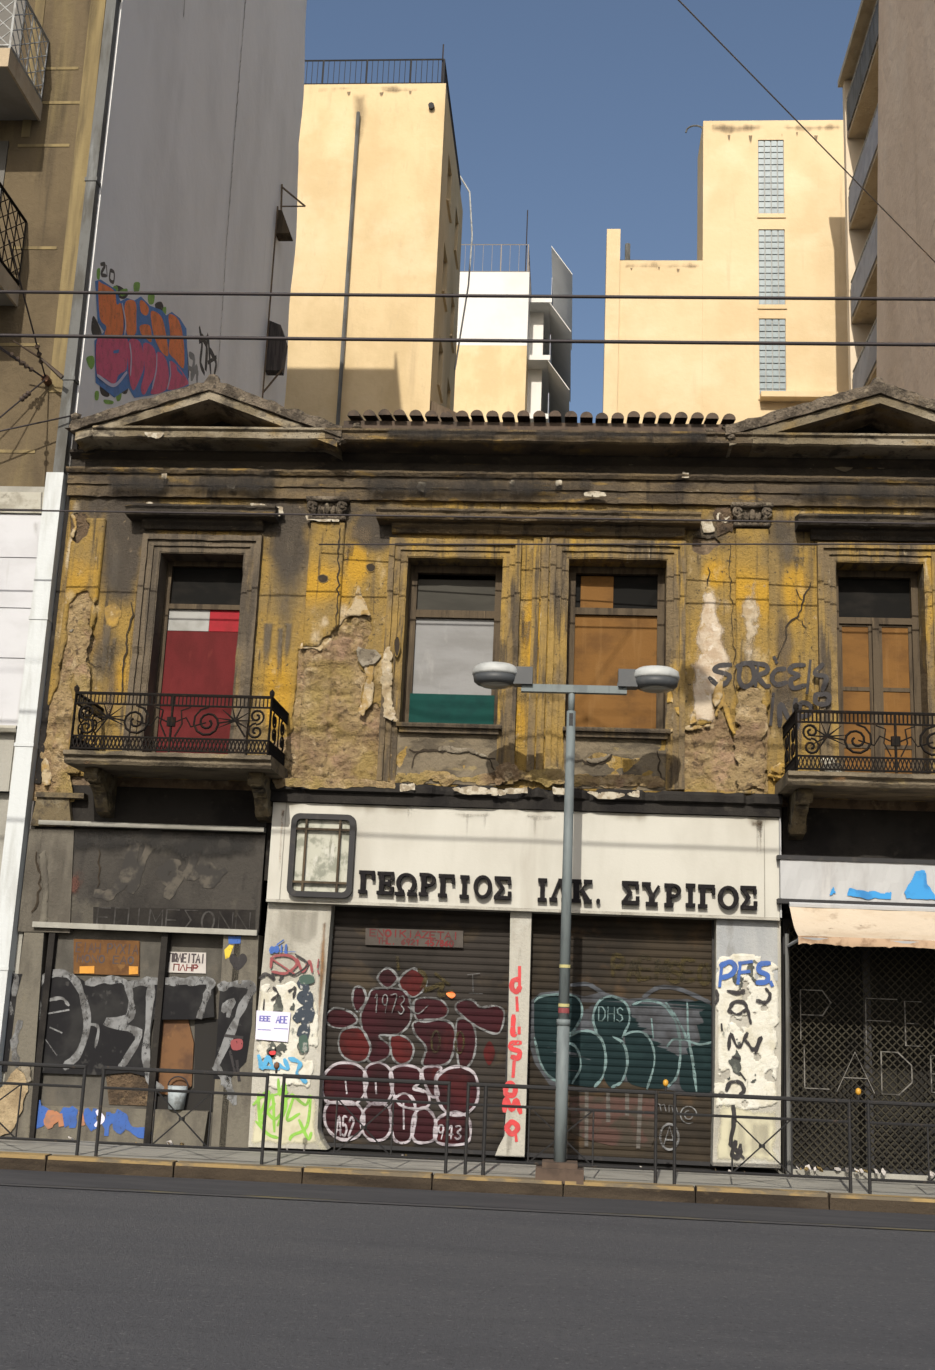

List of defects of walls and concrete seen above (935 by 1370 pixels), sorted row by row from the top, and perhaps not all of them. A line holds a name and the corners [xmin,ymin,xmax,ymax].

peeling [33,591,121,802]
peeling [266,563,665,799]
peeling [667,592,785,794]
crack [777,583,811,659]
peeling [718,1106,775,1160]